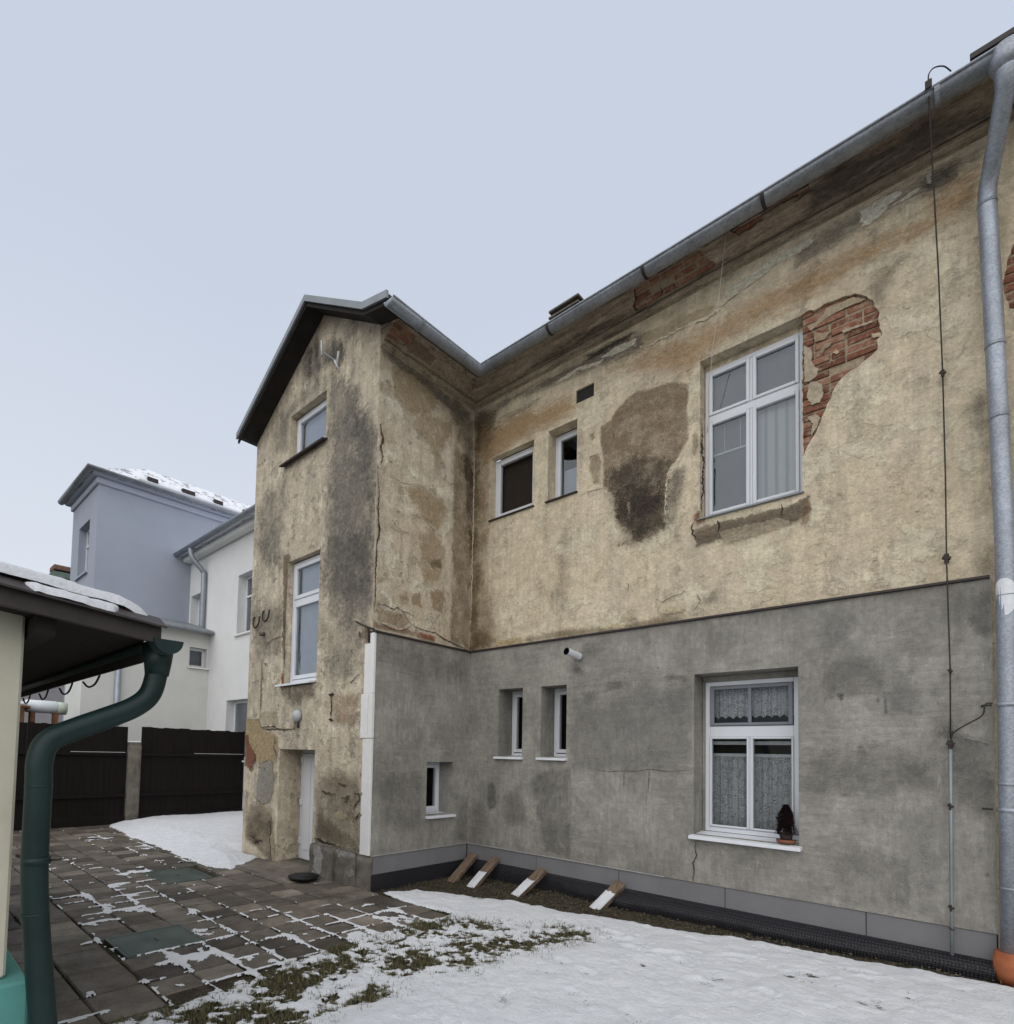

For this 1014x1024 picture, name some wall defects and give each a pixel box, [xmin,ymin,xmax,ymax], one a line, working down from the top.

peeling [601,235,814,358]
flaking render [803,295,882,453]
damp [798,155,978,262]
flaking render [1003,247,1014,309]
damp [323,385,373,613]
crack [373,423,466,650]
damp [384,332,647,649]
damp [600,383,689,546]
spalling [691,495,812,547]
peeling [245,718,278,799]